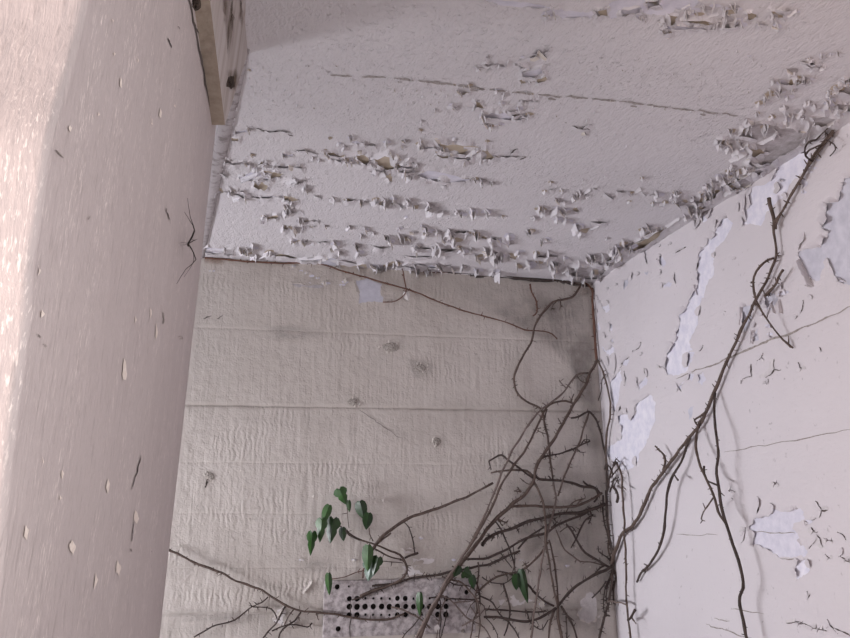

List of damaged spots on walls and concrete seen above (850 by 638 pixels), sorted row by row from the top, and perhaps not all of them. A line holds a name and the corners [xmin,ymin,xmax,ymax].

peeling [472,0,801,40]
crack [331,74,737,117]
peeling [203,50,850,472]
crack [677,294,850,385]
crack [726,429,850,452]
peeling [743,496,812,582]